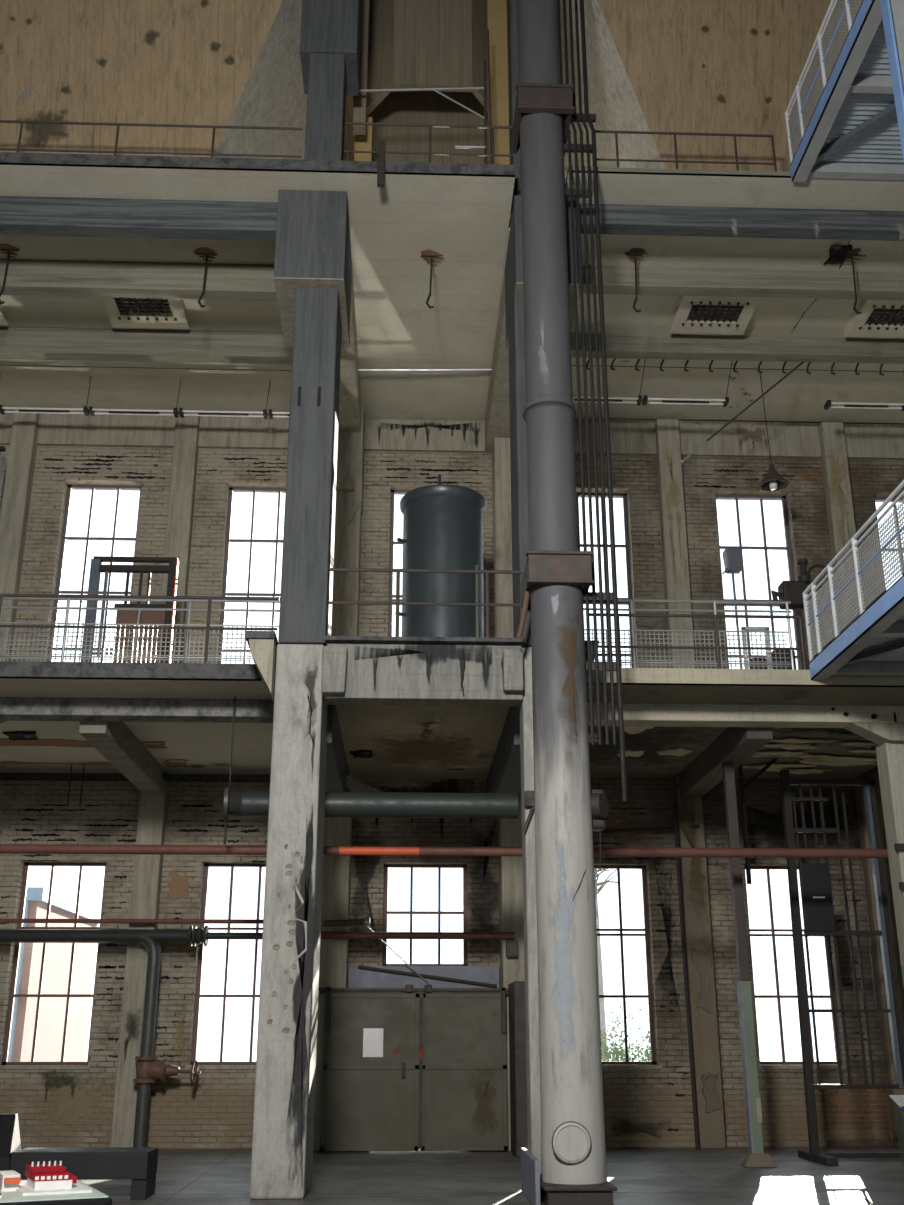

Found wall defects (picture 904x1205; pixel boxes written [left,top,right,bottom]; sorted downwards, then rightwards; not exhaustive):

leakage [26,111,66,146]
leakage [378,423,479,447]
leakage [357,644,503,689]
peeling [624,726,654,734]
peeling [617,748,692,757]
peeling [737,730,878,775]